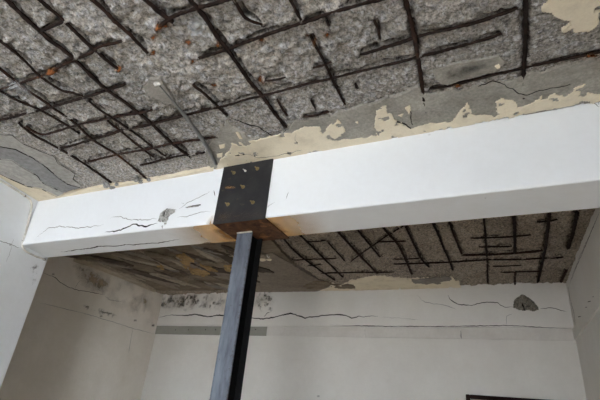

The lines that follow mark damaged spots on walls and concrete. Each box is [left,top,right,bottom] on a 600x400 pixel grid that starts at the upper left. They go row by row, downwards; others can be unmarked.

crack [478,80,570,96]
spalling [0,0,600,201]
crack [66,216,179,252]
spalling [158,208,175,229]
corrosion [266,216,302,236]
spalling [256,208,596,292]
flaking render [62,241,236,295]
spalling [513,295,539,311]
crack [158,312,224,320]
crack [254,312,458,327]